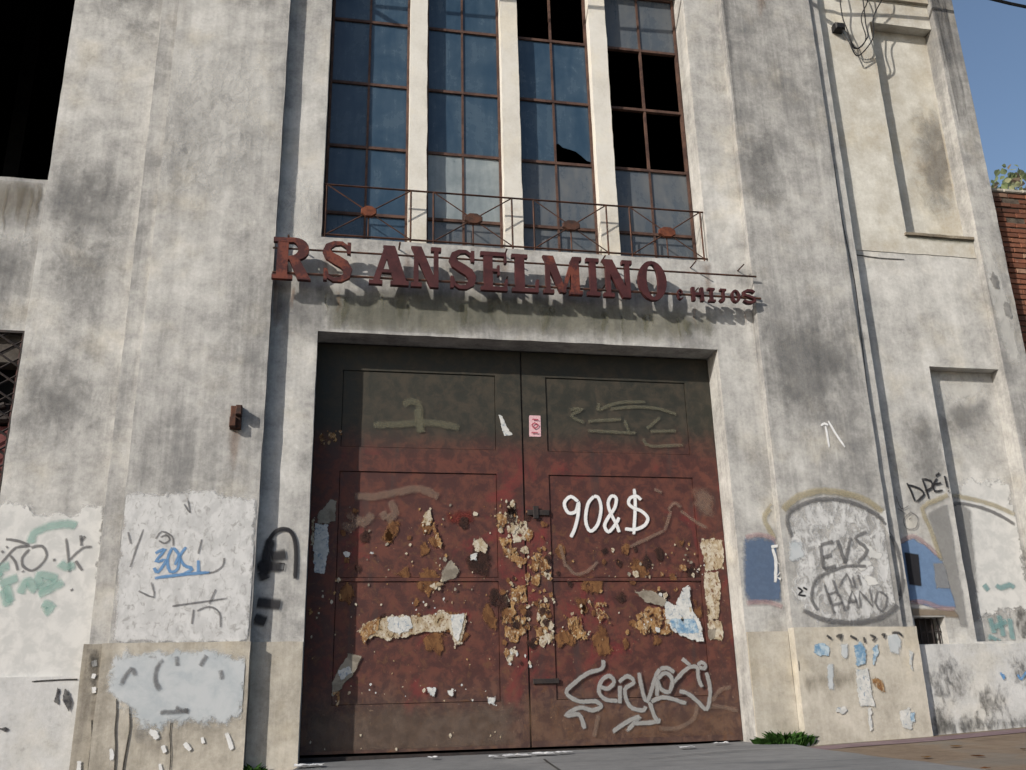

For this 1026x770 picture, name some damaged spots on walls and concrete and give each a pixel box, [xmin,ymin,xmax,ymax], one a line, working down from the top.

peeling [309,498,724,668]
peeling [333,666,376,707]
water stain [937,692,996,733]